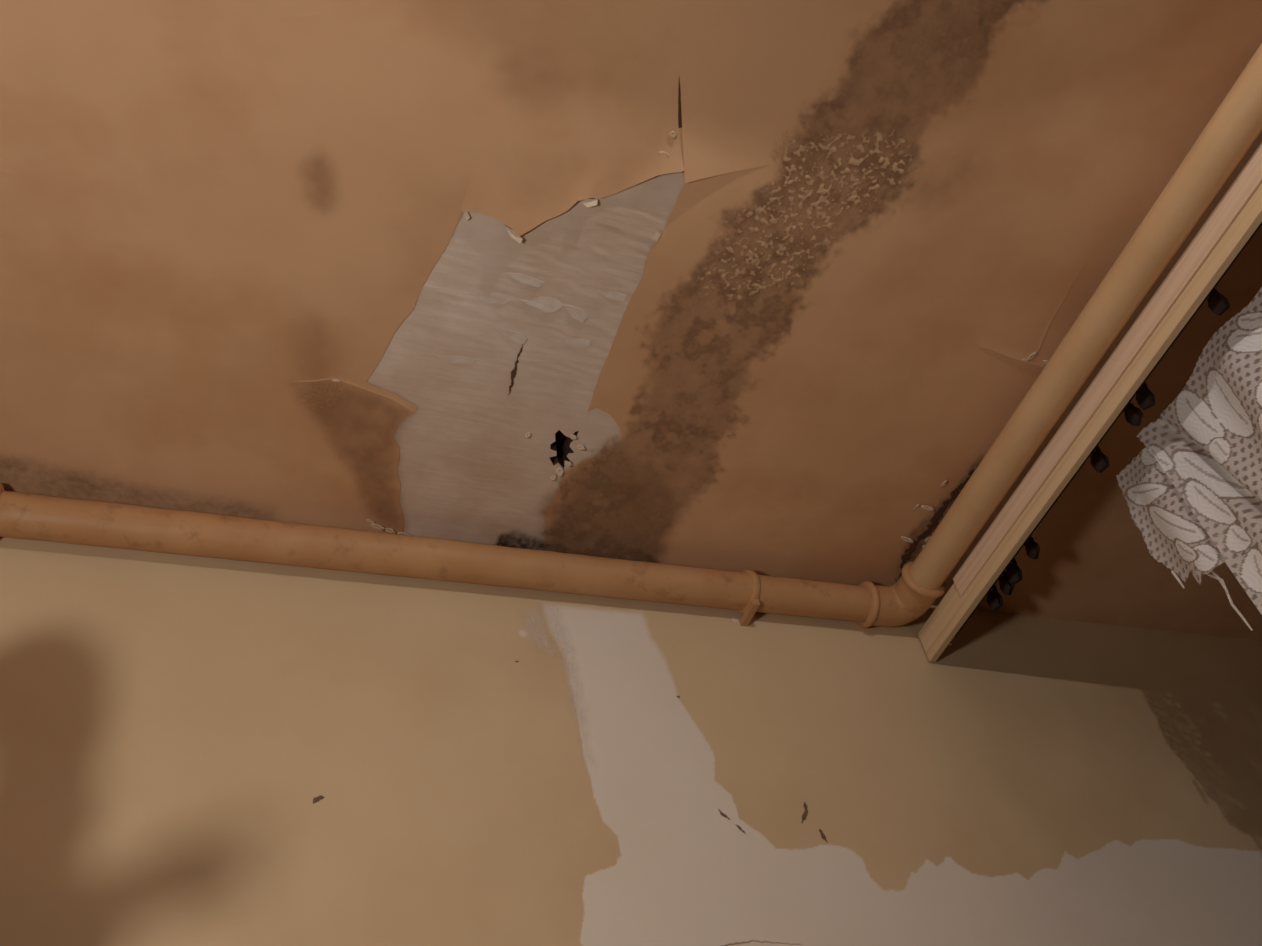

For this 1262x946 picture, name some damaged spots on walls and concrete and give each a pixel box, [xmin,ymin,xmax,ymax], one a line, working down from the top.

peeling [366,114,687,550]
leakage [497,319,748,563]
leakage [670,110,912,344]